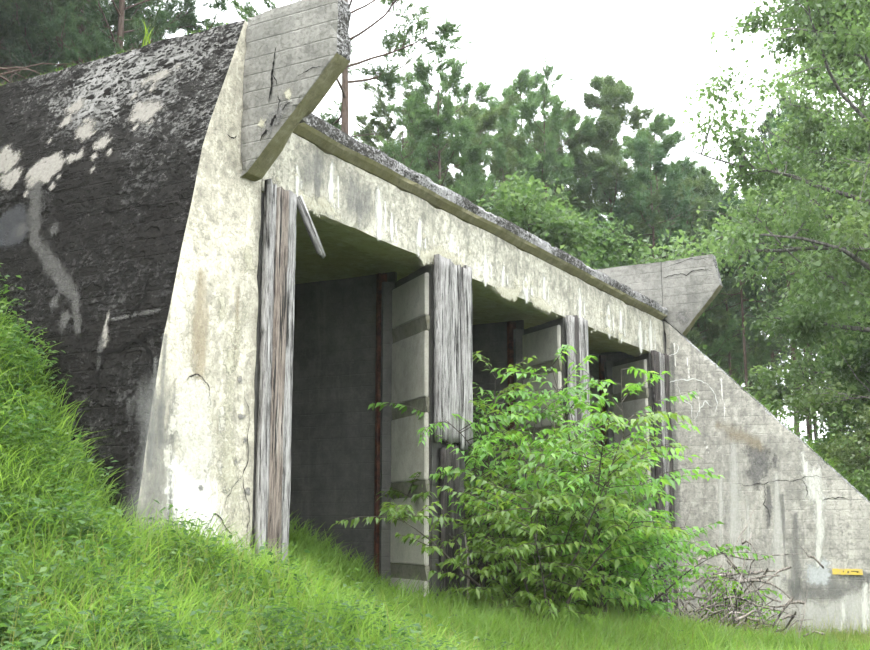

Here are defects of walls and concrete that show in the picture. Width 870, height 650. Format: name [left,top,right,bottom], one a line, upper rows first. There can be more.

damp [296,155,397,240]
damp [416,219,426,256]
damp [483,254,508,288]
damp [523,277,549,303]
damp [607,305,626,343]
damp [638,320,656,352]
damp [136,335,221,549]
crack [204,387,250,556]
damp [719,445,750,601]
crack [740,475,849,517]
damp [802,453,826,568]
damp [774,474,870,610]